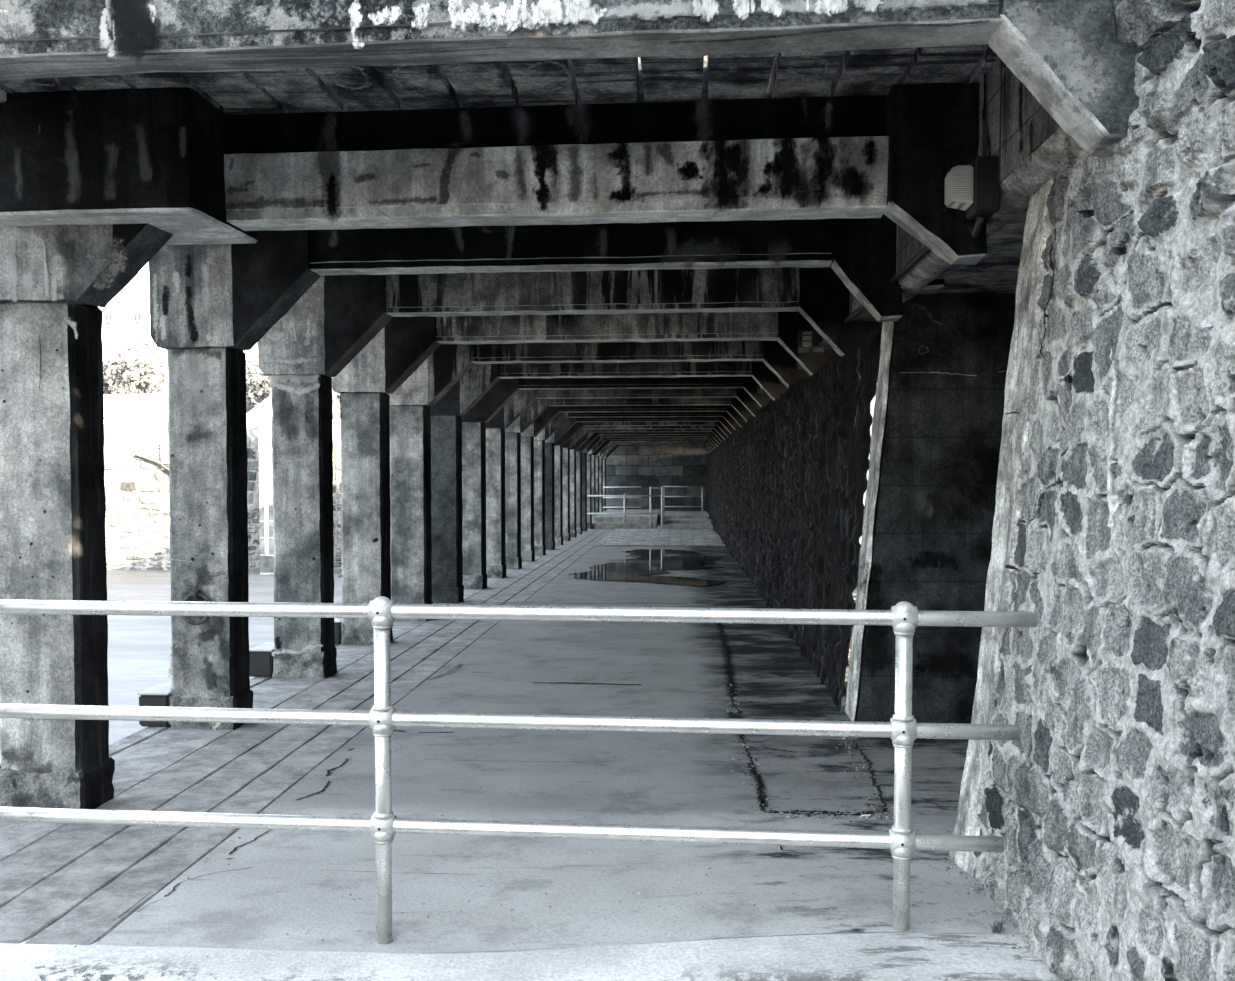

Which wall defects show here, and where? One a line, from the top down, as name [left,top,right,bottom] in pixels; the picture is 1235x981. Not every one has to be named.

peeling [368,3,430,29]
peeling [448,0,558,31]
water stain [226,112,341,247]
water stain [0,0,991,211]
water stain [1018,82,1032,163]
crack [720,629,887,815]